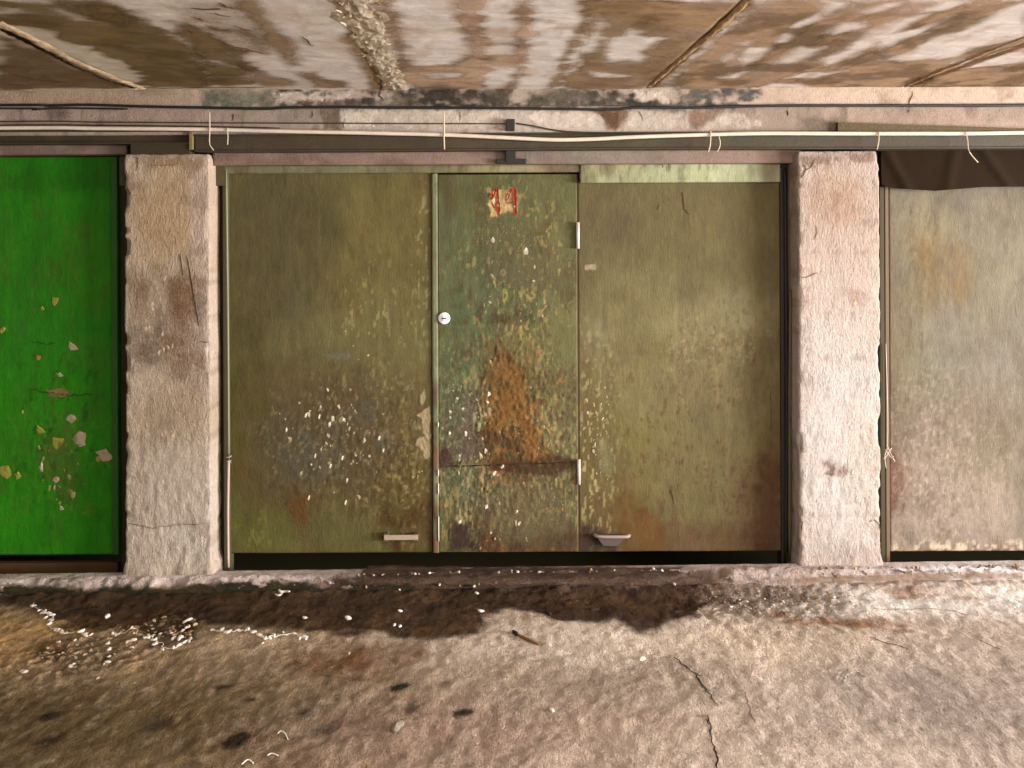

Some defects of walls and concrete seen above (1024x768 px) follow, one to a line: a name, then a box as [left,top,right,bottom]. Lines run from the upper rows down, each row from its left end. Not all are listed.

damp [0,0,1024,129]
peeling [489,226,550,288]
peeling [0,466,21,479]
peeling [47,373,70,397]
peeling [36,414,112,510]
peeling [279,384,431,505]
rust [475,351,571,499]
damp [0,565,805,647]
crack [674,657,719,768]